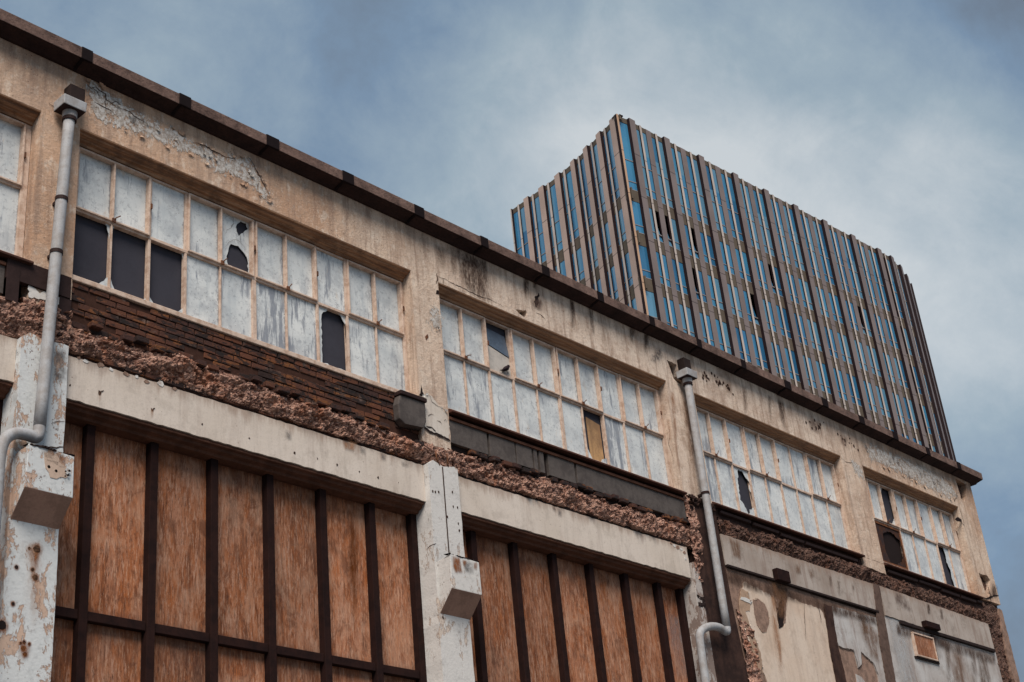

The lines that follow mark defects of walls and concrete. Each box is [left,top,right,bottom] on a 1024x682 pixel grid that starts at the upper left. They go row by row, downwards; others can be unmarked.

peeling [83,79,274,203]
spalling [0,285,996,626]
spalling [736,589,787,682]